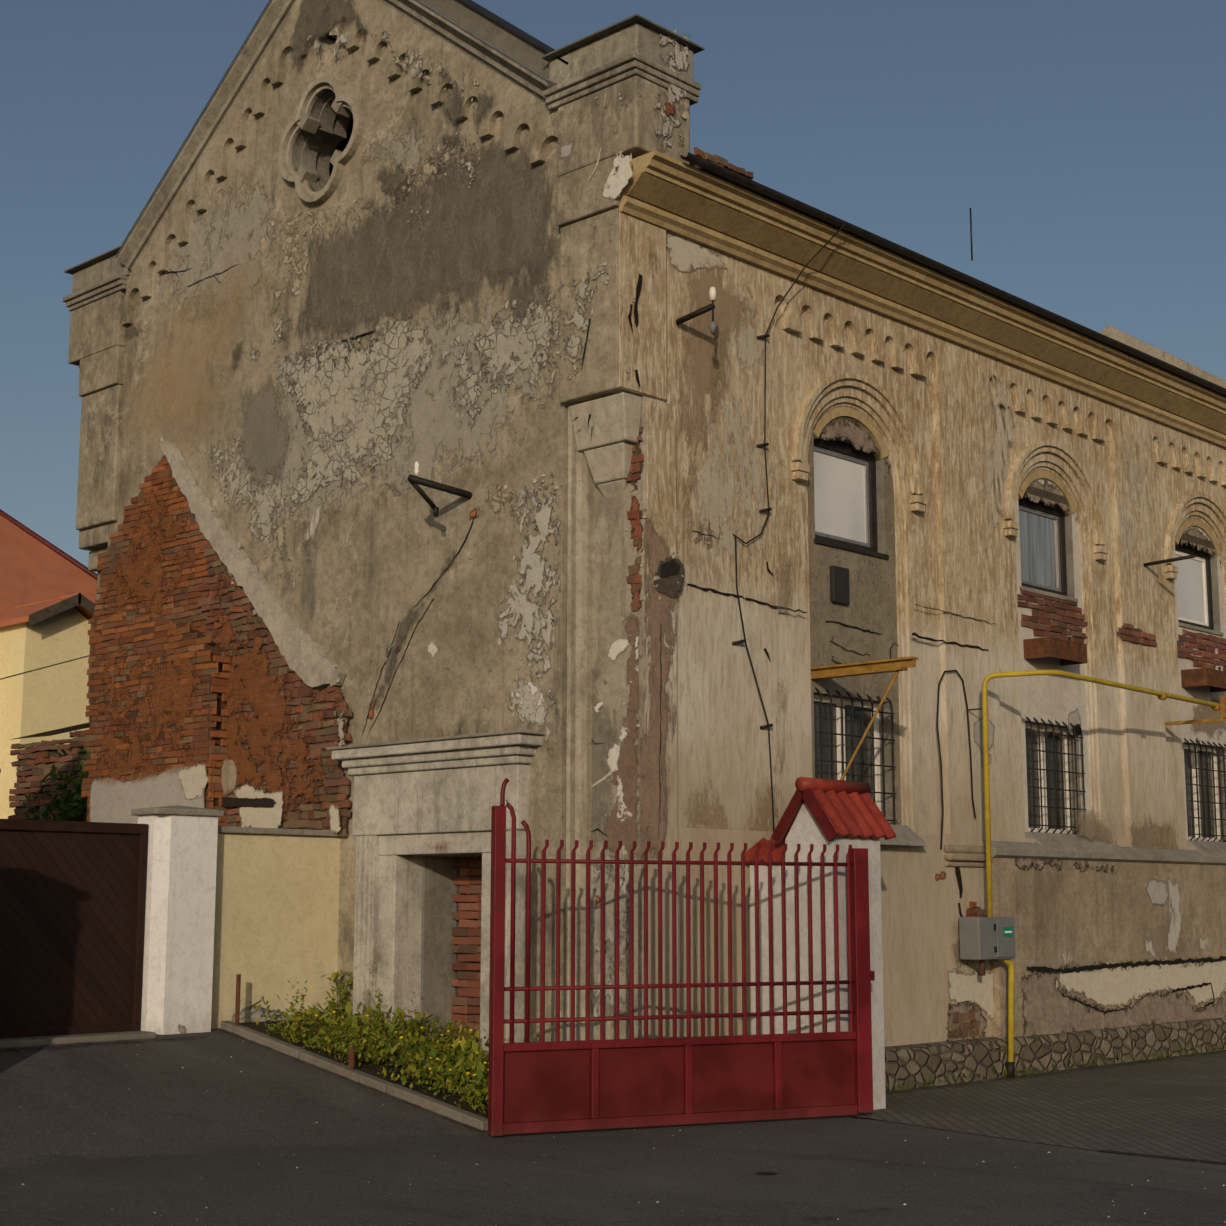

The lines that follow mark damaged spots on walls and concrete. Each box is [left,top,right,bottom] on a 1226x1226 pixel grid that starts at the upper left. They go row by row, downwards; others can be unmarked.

flaking render [603,151,633,201]
flaking render [81,120,609,837]
crack [362,518,474,738]
flaking render [591,403,785,1028]
flaking render [1118,623,1157,649]
flaking render [1021,957,1226,1036]